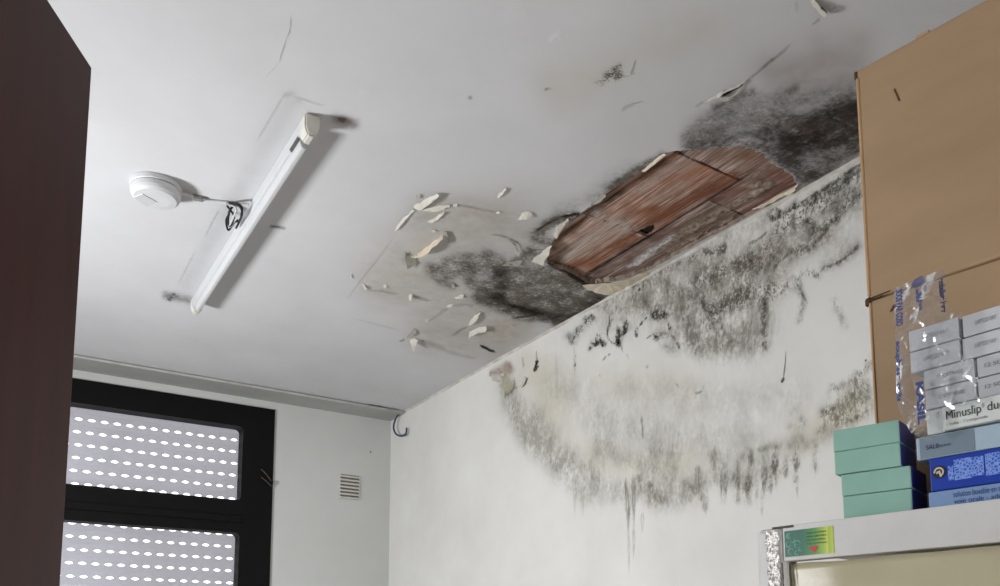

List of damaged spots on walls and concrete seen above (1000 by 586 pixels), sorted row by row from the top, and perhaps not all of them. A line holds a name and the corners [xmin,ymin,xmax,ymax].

crack [704,60,774,103]
peeling [395,193,458,270]
water stain [429,87,861,353]
flaking render [501,146,798,295]
peeling [468,312,495,352]
water stain [507,394,573,471]
water stain [818,360,872,432]